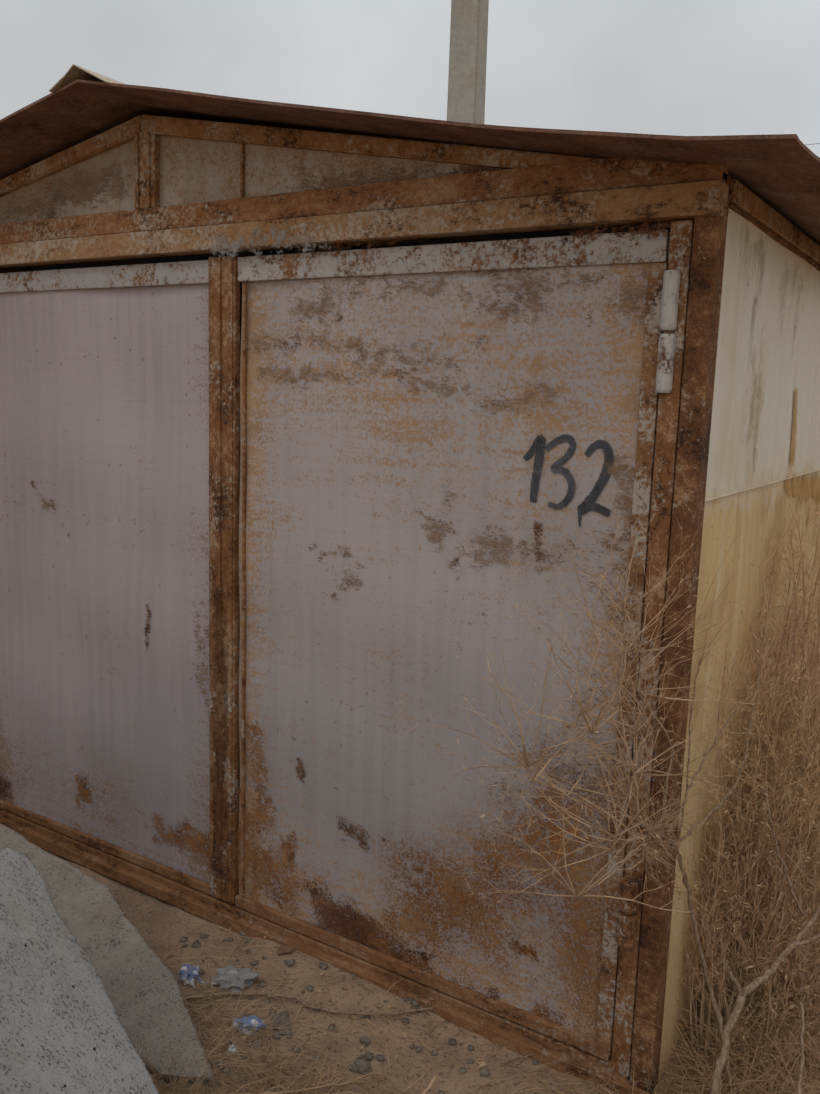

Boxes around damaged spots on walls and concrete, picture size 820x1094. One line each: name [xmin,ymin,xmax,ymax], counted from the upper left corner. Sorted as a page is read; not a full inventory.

rust [533,522,544,562]
rust [151,588,227,885]
rust [237,722,615,1035]